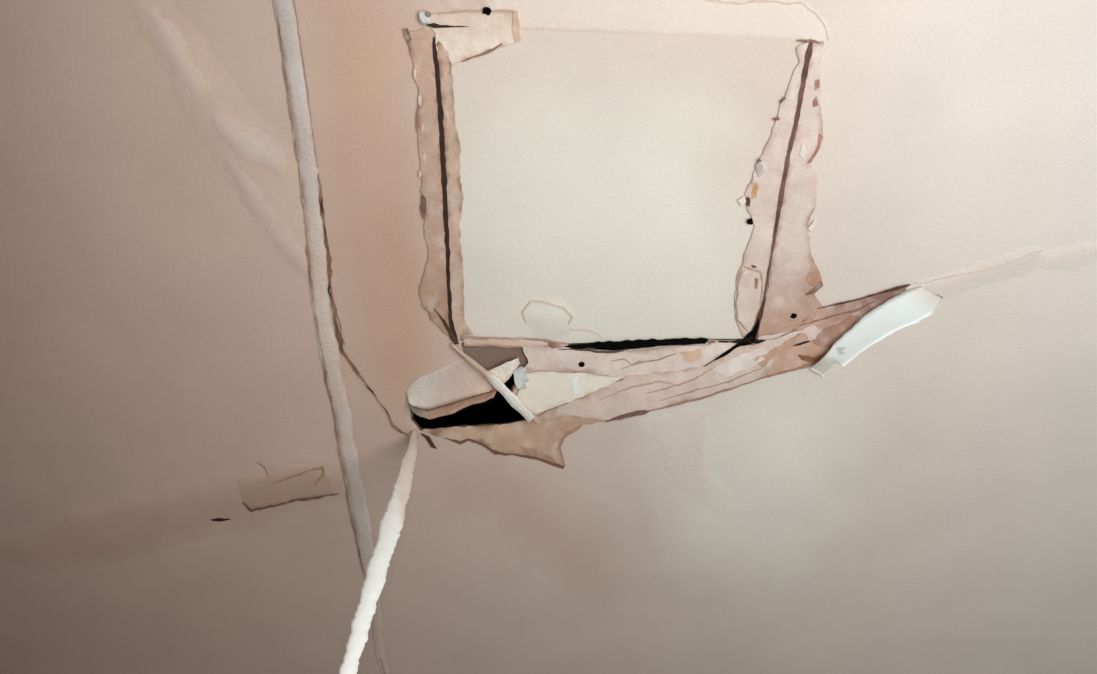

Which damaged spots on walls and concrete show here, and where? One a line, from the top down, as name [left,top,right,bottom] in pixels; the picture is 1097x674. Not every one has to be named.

peeling [800,133,823,163]
crack [318,174,437,449]
spalling [405,343,497,431]
peeling [680,339,715,363]
peeling [806,262,823,295]
peeling [811,286,943,377]